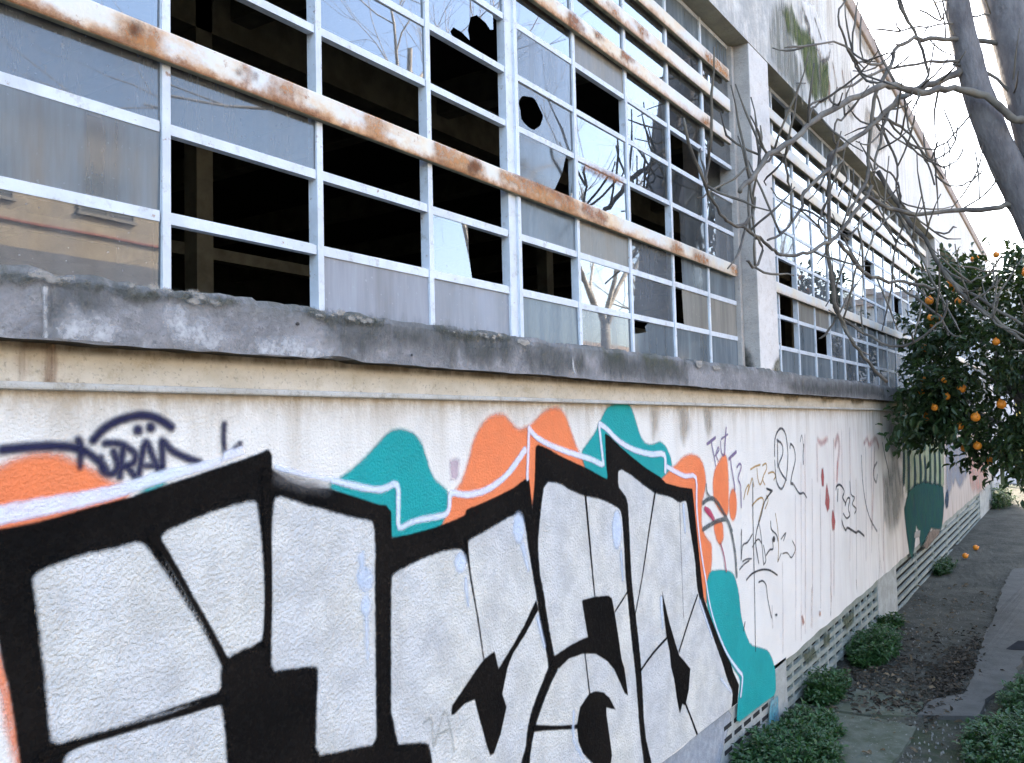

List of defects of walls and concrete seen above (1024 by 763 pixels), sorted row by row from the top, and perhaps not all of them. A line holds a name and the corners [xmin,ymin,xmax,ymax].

rust [117,22,160,52]
rust [569,13,580,31]
damp [770,4,803,99]
rust [435,142,483,176]
rust [501,171,608,222]